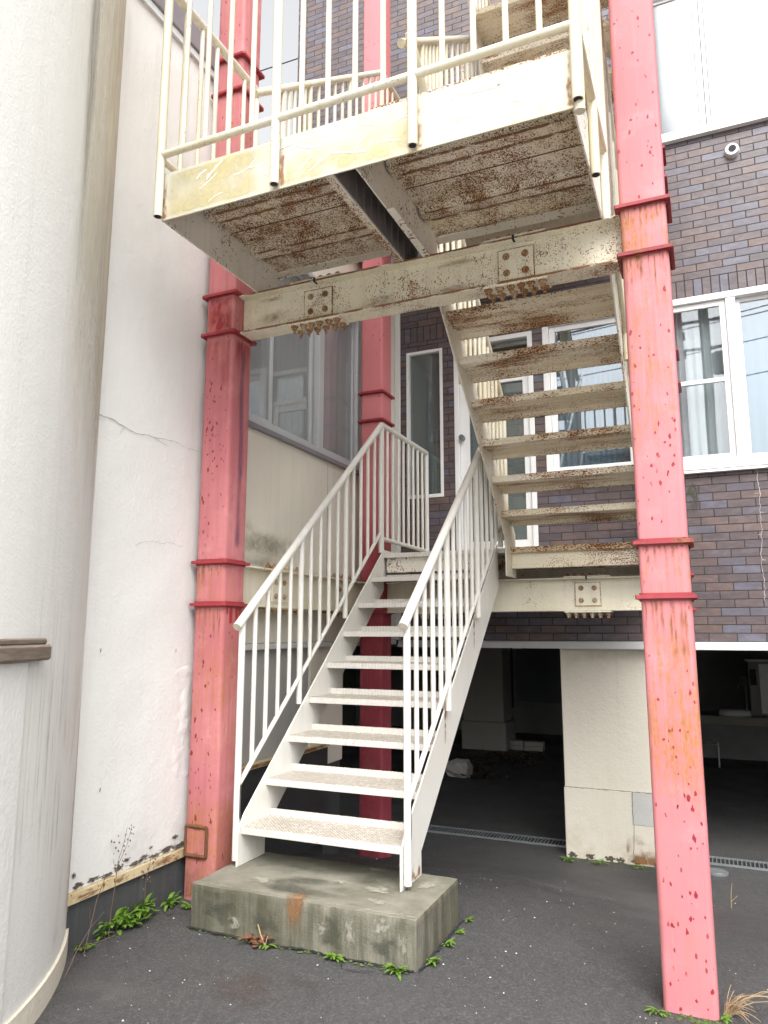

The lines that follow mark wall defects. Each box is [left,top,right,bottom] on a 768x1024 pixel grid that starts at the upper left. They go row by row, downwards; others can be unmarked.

corrosion [398,121,568,174]
corrosion [216,156,337,222]
corrosion [428,175,587,221]
corrosion [393,218,602,264]
corrosion [245,266,379,295]
corrosion [498,261,613,284]
corrosion [243,285,485,332]
crack [99,414,199,452]
peeling [72,835,184,890]
damp [255,877,322,893]
damp [319,920,352,944]
damp [375,919,405,953]